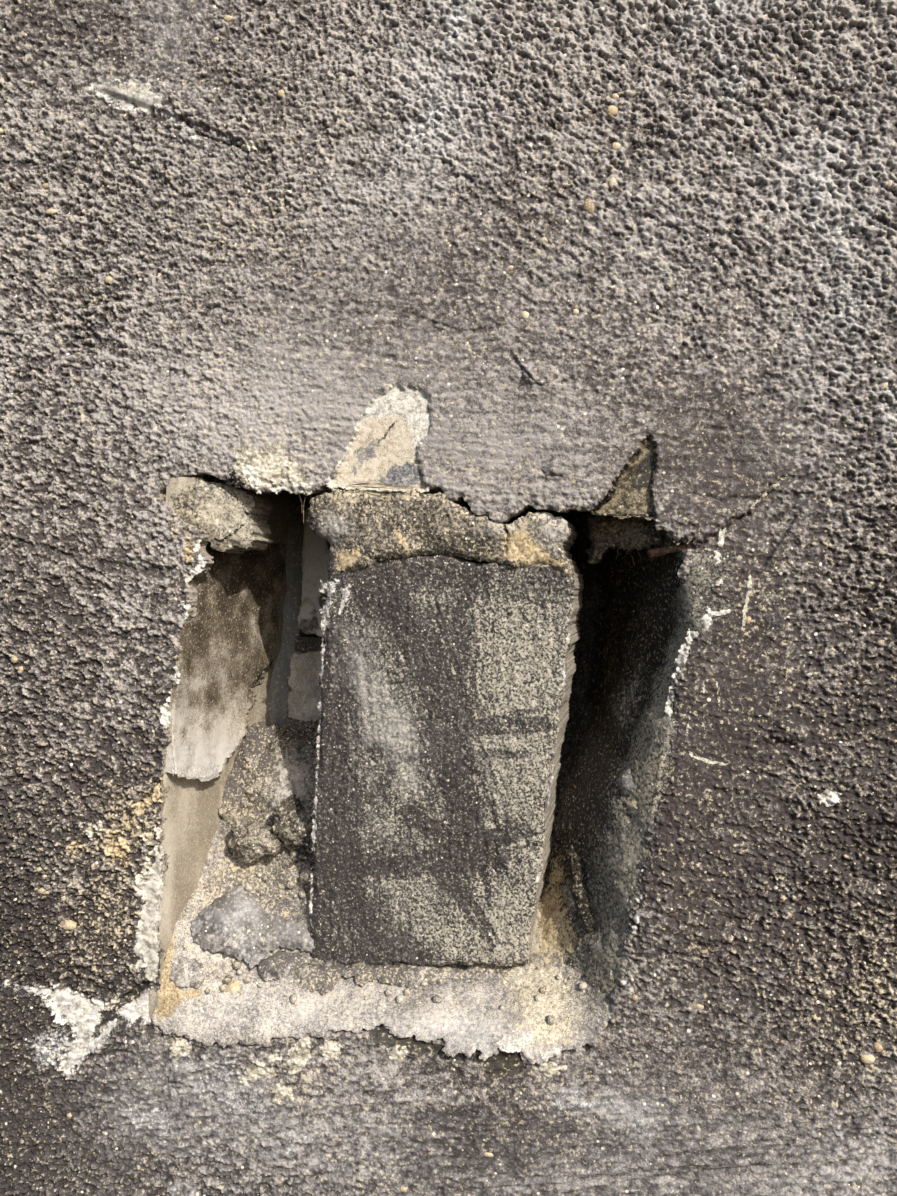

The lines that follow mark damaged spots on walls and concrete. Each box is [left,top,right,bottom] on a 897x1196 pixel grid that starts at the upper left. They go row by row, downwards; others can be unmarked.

crack [190,126,241,148]
flaking render [233,382,433,495]
flaking render [593,436,657,520]
crack [590,435,788,545]
flaking render [713,528,726,564]
flaking render [160,542,286,782]
flaking render [665,606,730,721]
spalling [287,579,351,857]
flaking render [167,1037,192,1058]
flaking render [239,1036,343,1104]
flaking render [369,1026,451,1061]
flaking render [483,1029,567,1078]